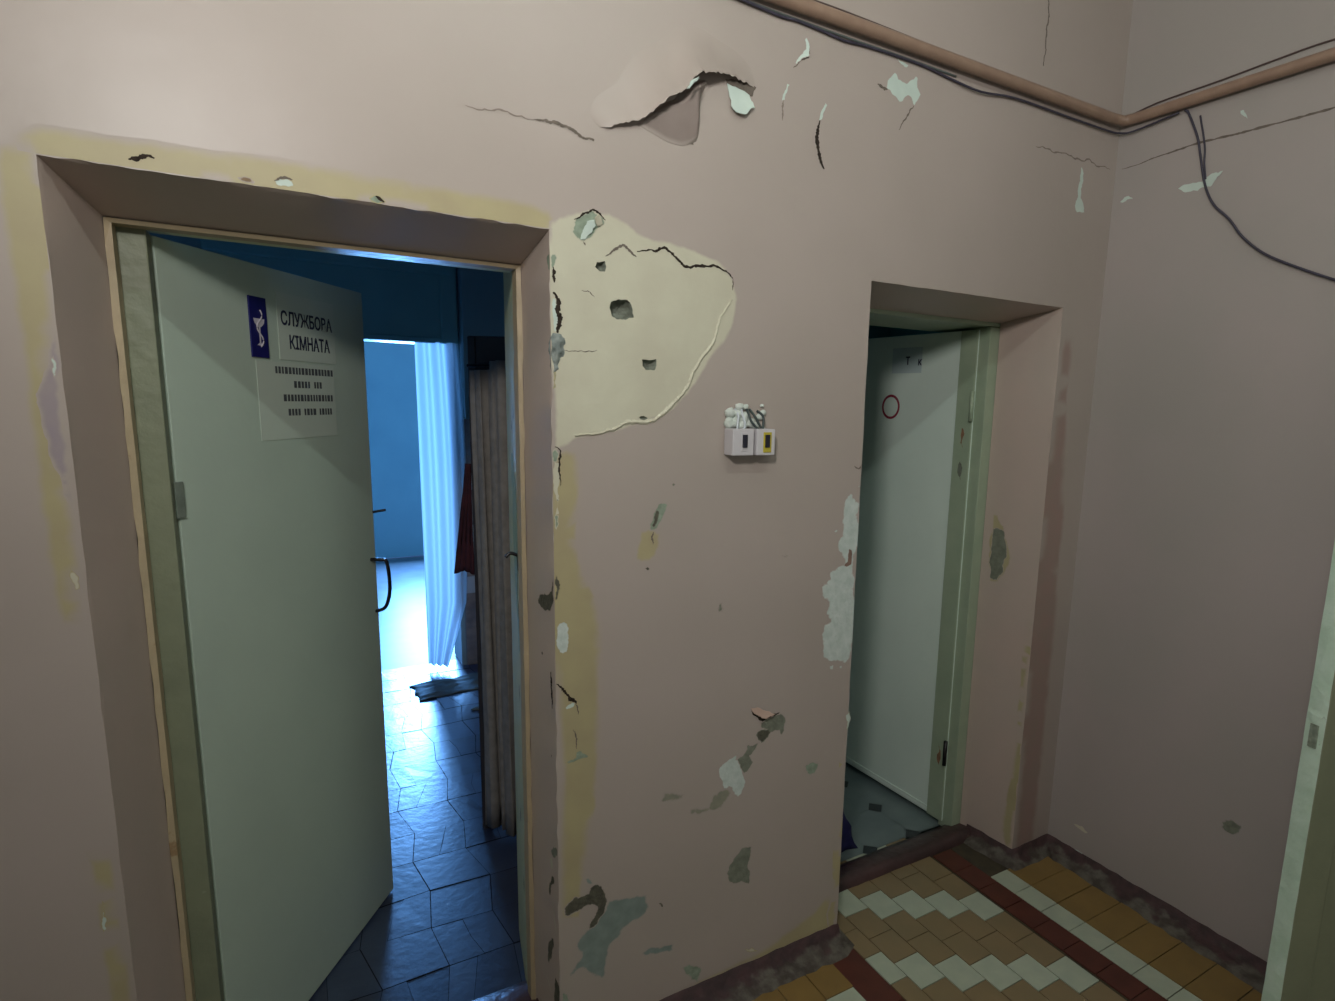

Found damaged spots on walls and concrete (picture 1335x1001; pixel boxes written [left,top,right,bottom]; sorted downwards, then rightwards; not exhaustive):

peeling [878,58,921,130]
peeling [815,103,827,169]
flaking render [724,403,766,429]
peeling [0,123,739,1001]
flaking render [988,513,1011,583]
peeling [650,665,851,1001]